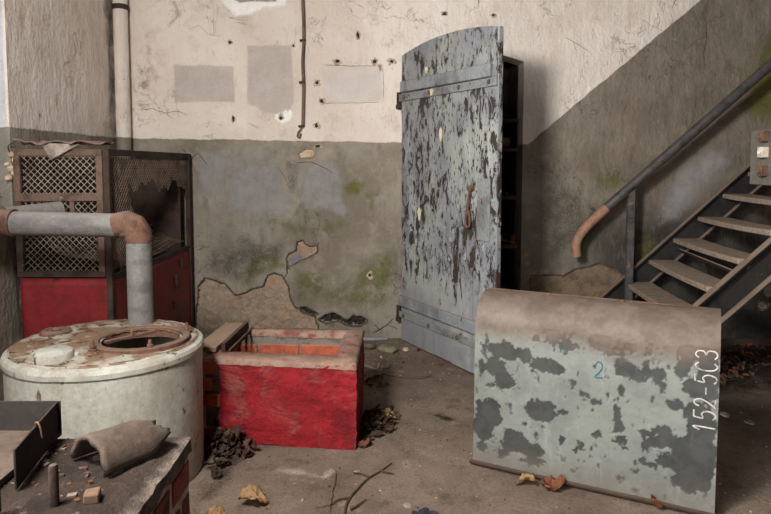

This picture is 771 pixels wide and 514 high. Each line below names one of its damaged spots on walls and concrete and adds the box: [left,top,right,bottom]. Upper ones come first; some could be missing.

spalling [194,240,368,450]
spalling [529,262,623,297]